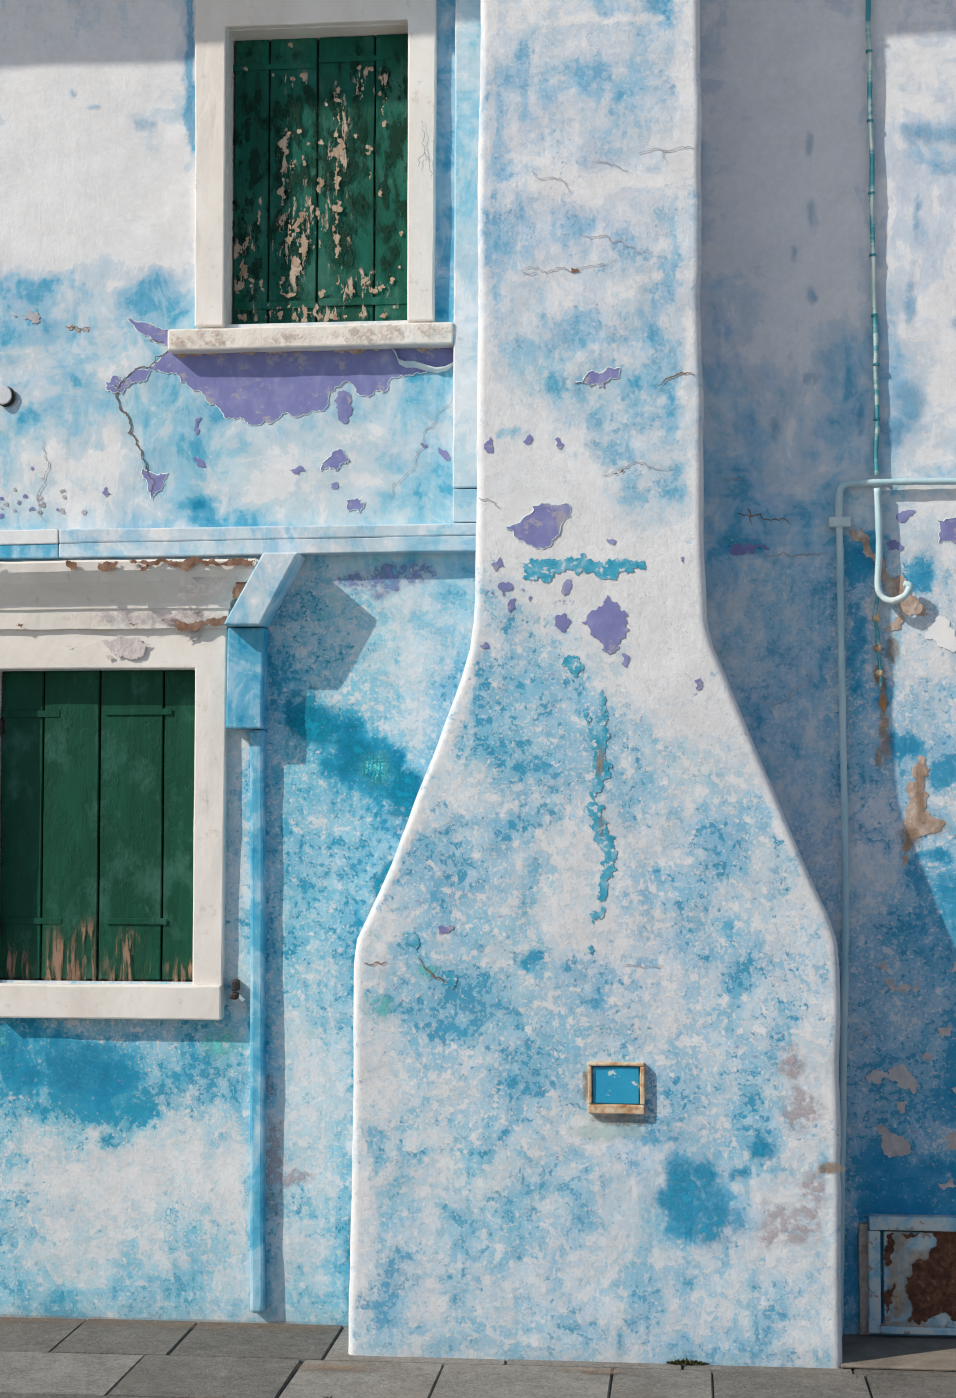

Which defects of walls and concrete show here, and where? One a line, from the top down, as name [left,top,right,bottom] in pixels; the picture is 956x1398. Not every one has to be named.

crack [592,146,697,170]
crack [521,235,651,275]
crack [105,339,168,500]
peeling [109,318,454,435]
peeling [290,448,365,513]
flaking render [98,557,258,599]
flaking render [161,611,227,642]
peeling [491,502,646,668]
flaking render [849,528,956,653]
peeling [938,517,956,545]
flaking render [901,755,956,866]
corrosion [882,1231,956,1326]